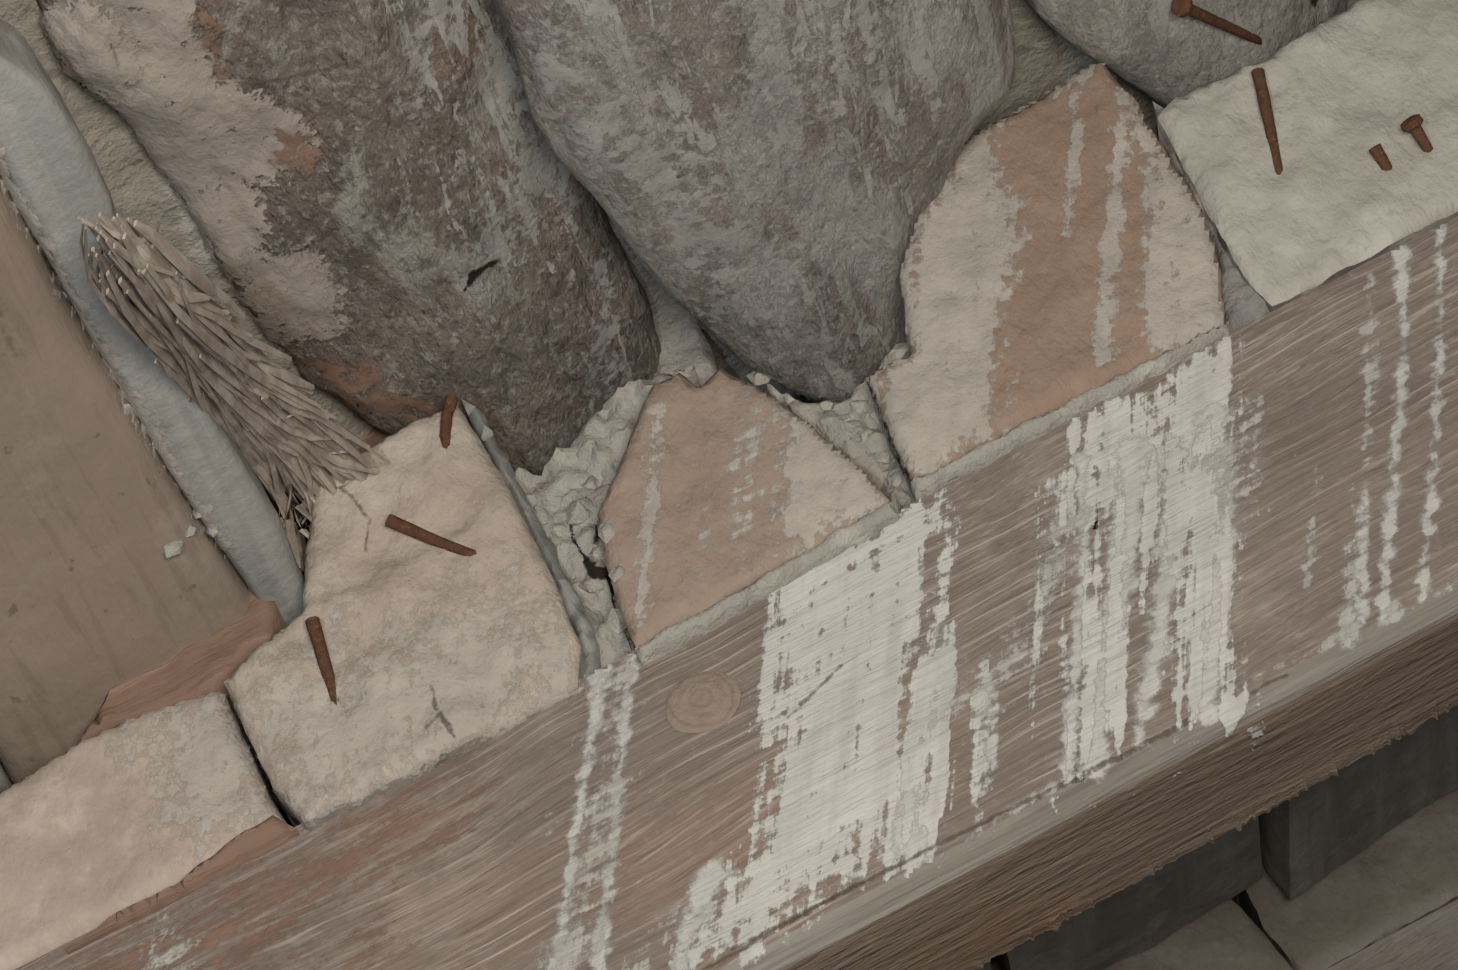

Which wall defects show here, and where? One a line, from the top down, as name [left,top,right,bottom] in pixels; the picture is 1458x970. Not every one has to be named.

spalling [877,448,903,486]